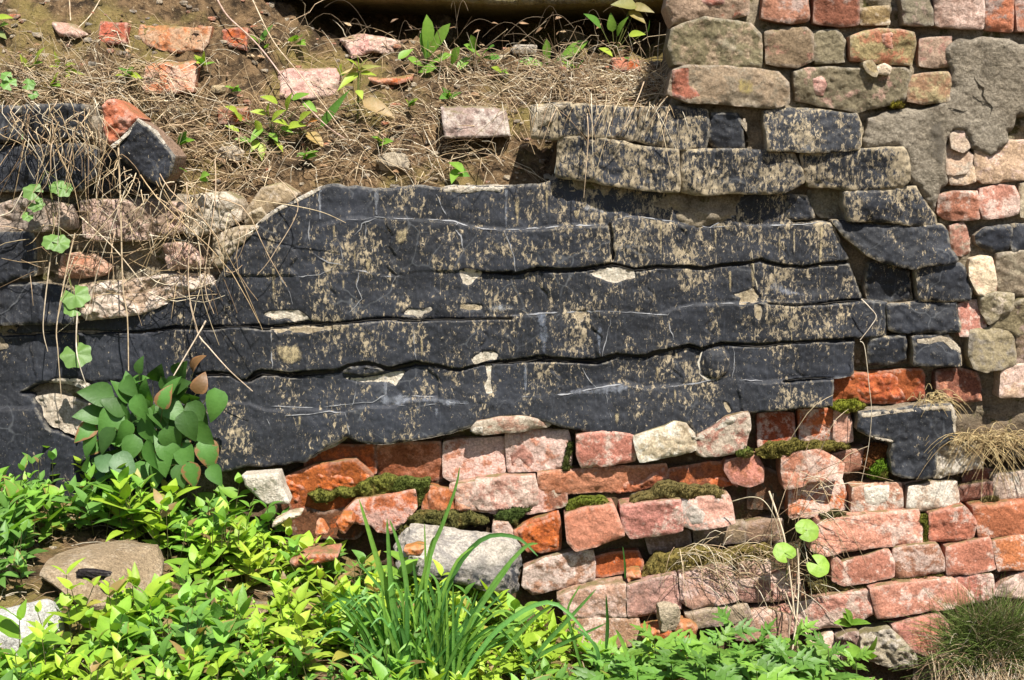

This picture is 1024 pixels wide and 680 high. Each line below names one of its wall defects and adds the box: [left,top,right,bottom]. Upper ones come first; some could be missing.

crack [951,77,993,115]
peeling [589,266,636,283]
crack [15,194,857,431]
peeling [472,351,498,394]